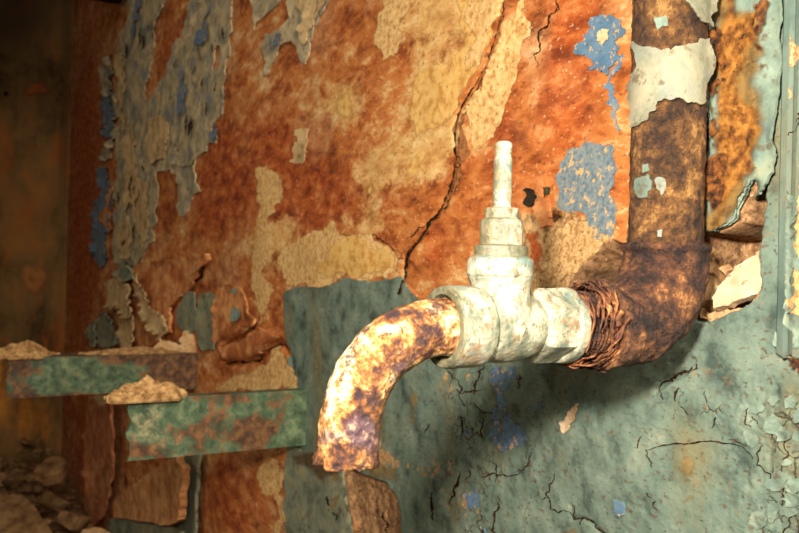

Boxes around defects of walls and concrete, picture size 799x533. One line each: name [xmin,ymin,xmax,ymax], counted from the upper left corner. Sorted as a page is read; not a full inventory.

peeling [85,0,398,392]
crack [372,0,512,294]
corrosion [527,233,542,265]
crack [533,0,560,65]
peeling [519,142,618,291]
peeling [573,0,719,159]
corrosion [704,0,769,231]
peeling [704,0,799,234]
peeling [783,191,799,358]
crack [659,364,697,401]
crack [430,452,532,521]
crack [637,408,792,533]